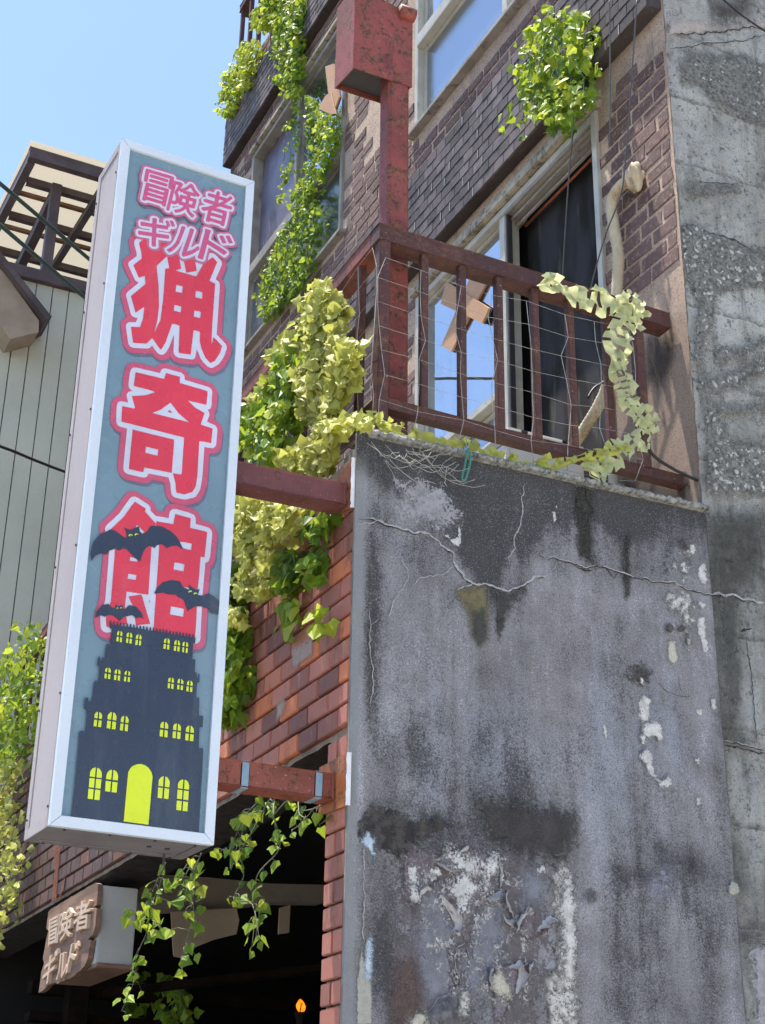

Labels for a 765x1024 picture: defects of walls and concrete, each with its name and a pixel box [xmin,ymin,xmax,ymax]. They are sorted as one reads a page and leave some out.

water stain [573,487,596,564]
water stain [456,586,527,645]
crack [360,486,765,755]
water stain [622,535,634,600]
spalling [659,537,710,665]
water stain [357,804,453,860]
water stain [473,794,581,868]
water stain [364,937,373,980]
peeling [383,830,583,1024]